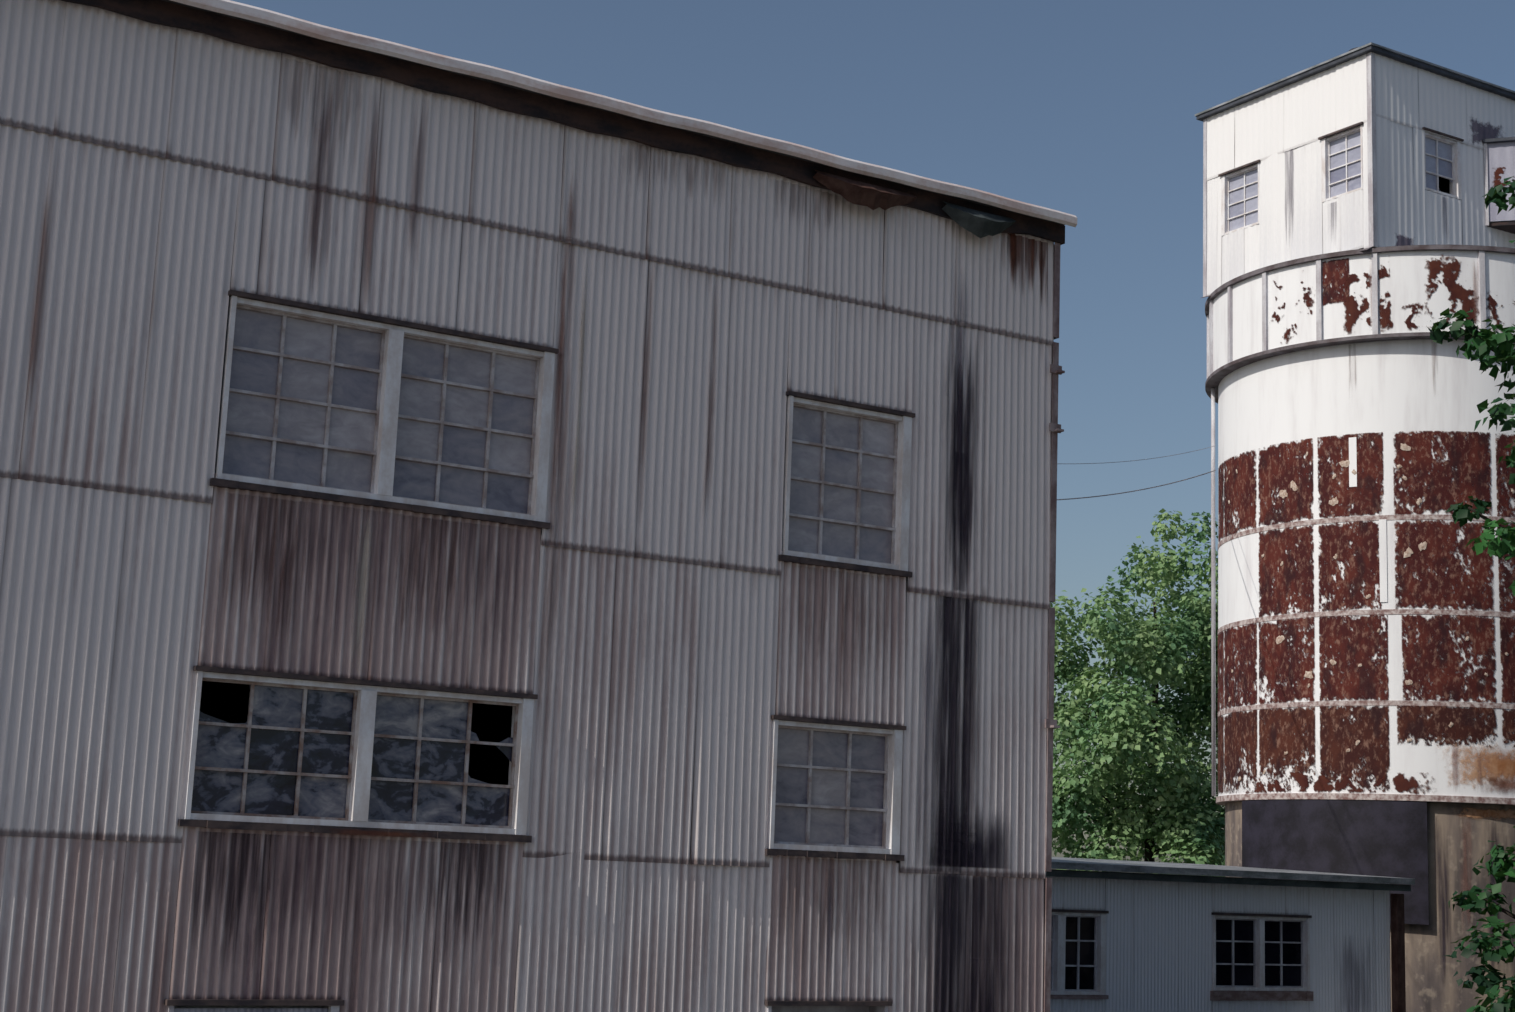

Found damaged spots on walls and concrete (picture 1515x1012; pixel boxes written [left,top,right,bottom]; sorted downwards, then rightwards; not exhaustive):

rust [1010,234,1048,296]
damp [950,352,973,576]
damp [357,532,369,638]
rust [1218,431,1515,794]
damp [935,596,1004,1012]